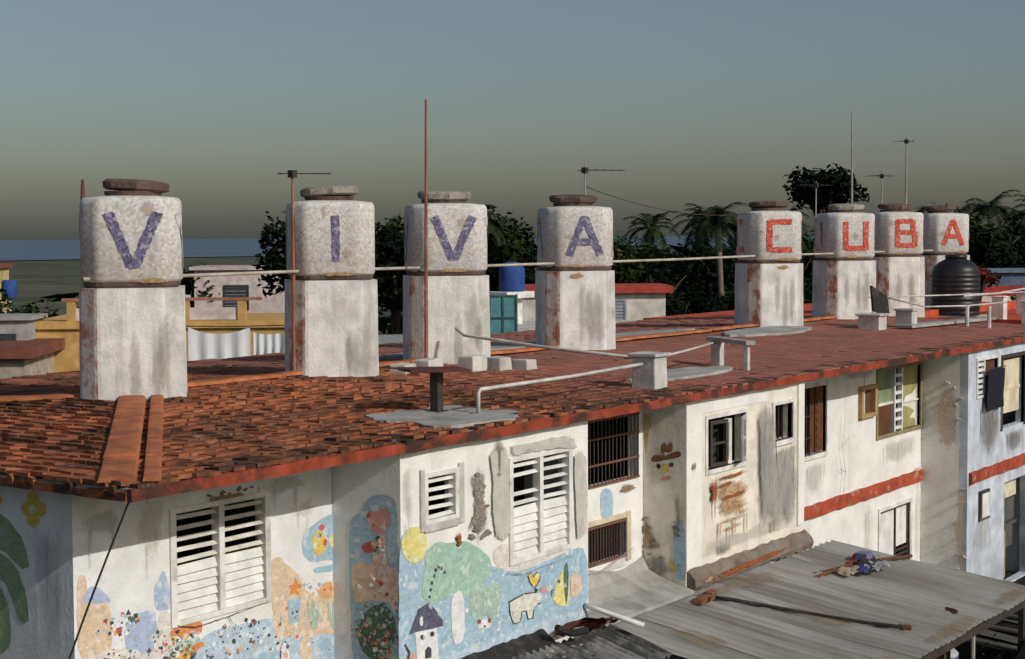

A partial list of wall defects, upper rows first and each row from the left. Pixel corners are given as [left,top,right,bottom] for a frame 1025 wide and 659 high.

peeling [936,381,964,450]
spalling [455,472,492,546]
peeling [512,435,588,538]
peeling [717,417,796,543]